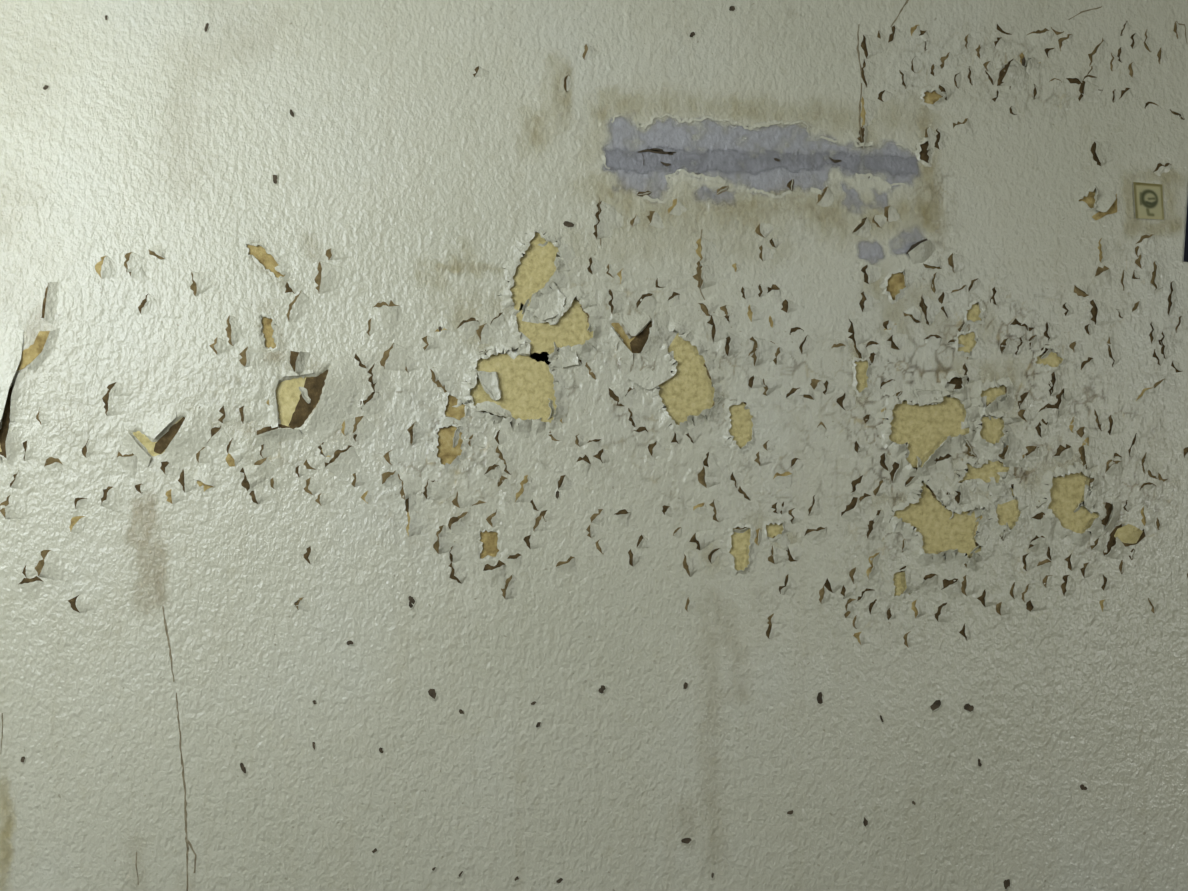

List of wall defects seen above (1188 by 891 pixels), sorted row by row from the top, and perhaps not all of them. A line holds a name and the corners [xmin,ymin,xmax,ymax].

peeling [854,21,1185,150]
peeling [915,118,974,167]
peeling [1090,141,1118,166]
peeling [593,169,729,239]
peeling [1074,185,1117,221]
peeling [0,282,63,519]
peeling [82,439,98,458]
peeling [95,221,1186,645]
peeling [70,486,126,535]
peeling [19,550,81,599]
peeling [68,595,96,613]
crack [162,606,197,891]